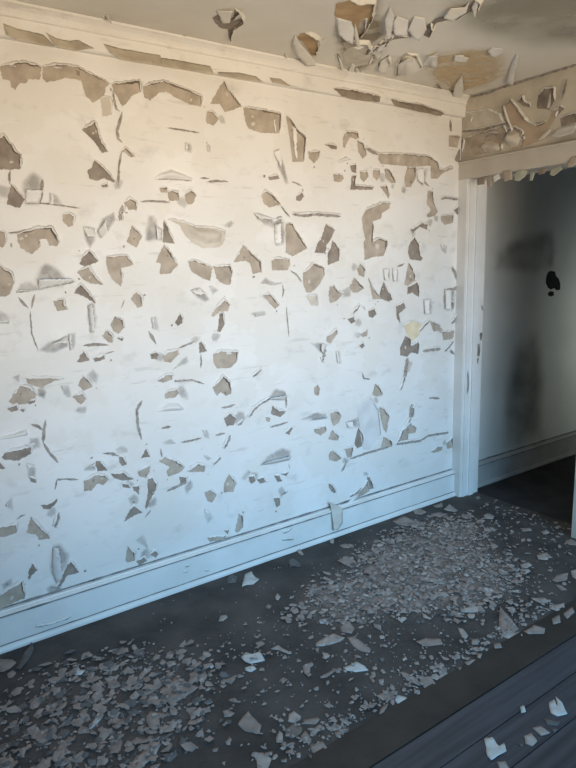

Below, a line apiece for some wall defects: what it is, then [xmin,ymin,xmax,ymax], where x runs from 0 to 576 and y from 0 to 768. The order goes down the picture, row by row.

peeling [213,8,246,42]
peeling [334,0,484,75]
peeling [0,44,576,363]
peeling [8,375,64,412]
peeling [150,341,244,436]
peeling [266,391,288,422]
peeling [310,409,364,462]
peeling [378,404,417,450]
peeling [0,442,37,483]
peeling [83,443,208,521]
peeling [204,473,237,513]
peeling [0,515,86,589]